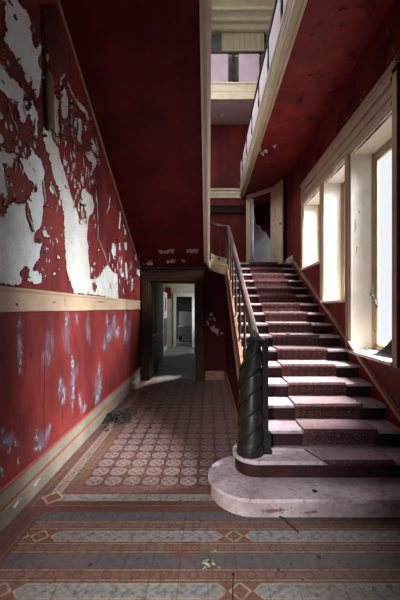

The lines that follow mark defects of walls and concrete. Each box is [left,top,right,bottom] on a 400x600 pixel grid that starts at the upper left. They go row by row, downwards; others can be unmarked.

peeling [0,0,153,298]
leakage [42,330,54,365]
leakage [62,310,91,352]
leakage [103,310,131,350]
leakage [58,359,87,413]
leakage [94,361,102,404]
leakage [34,424,51,453]